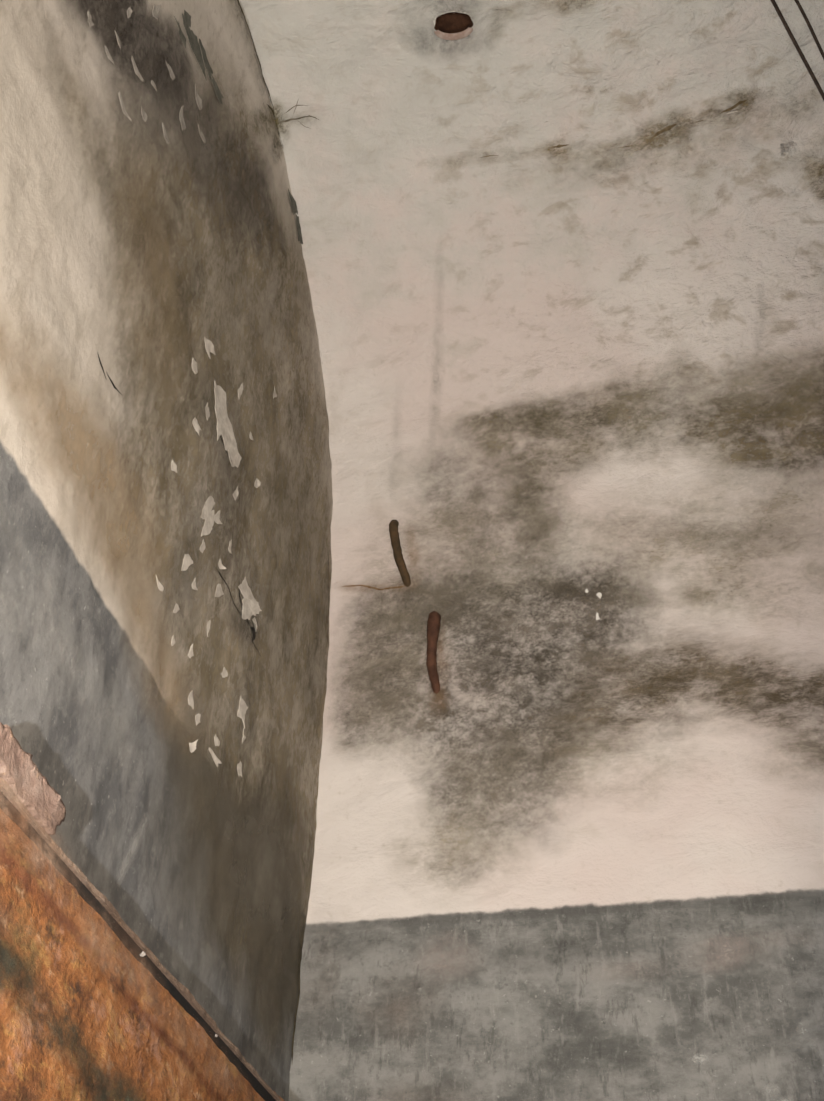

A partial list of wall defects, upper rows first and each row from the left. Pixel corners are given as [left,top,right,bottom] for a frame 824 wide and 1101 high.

peeling [204,337,215,359]
peeling [192,380,243,468]
leakage [683,365,824,470]
leakage [48,0,332,995]
leakage [473,391,666,549]
peeling [181,496,222,590]
peeling [238,578,262,638]
peeling [188,690,201,726]
peeling [189,734,222,767]
peeling [237,695,248,743]
leakage [347,568,824,864]